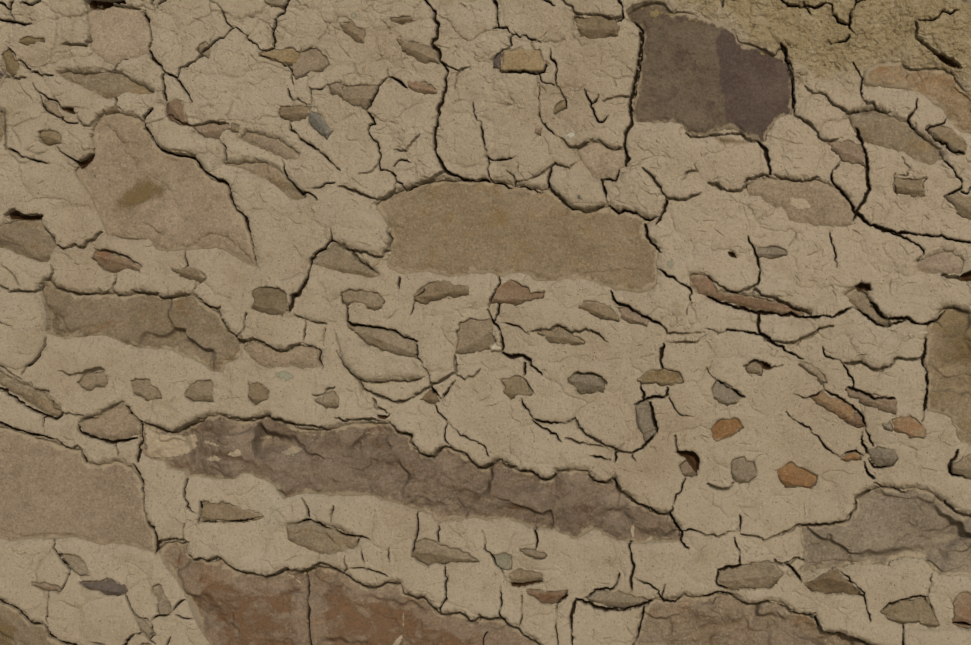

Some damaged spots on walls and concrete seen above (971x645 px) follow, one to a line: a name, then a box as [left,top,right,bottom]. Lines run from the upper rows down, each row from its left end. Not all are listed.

crack [0,1,41,26]
crack [115,0,328,261]
crack [284,125,339,200]
crack [288,232,425,365]
crack [367,75,418,191]
crack [425,0,552,193]
crack [489,0,942,478]
crack [831,128,971,255]
crack [907,100,971,196]
crack [0,387,160,552]
peeling [145,428,241,462]
crack [555,516,742,645]